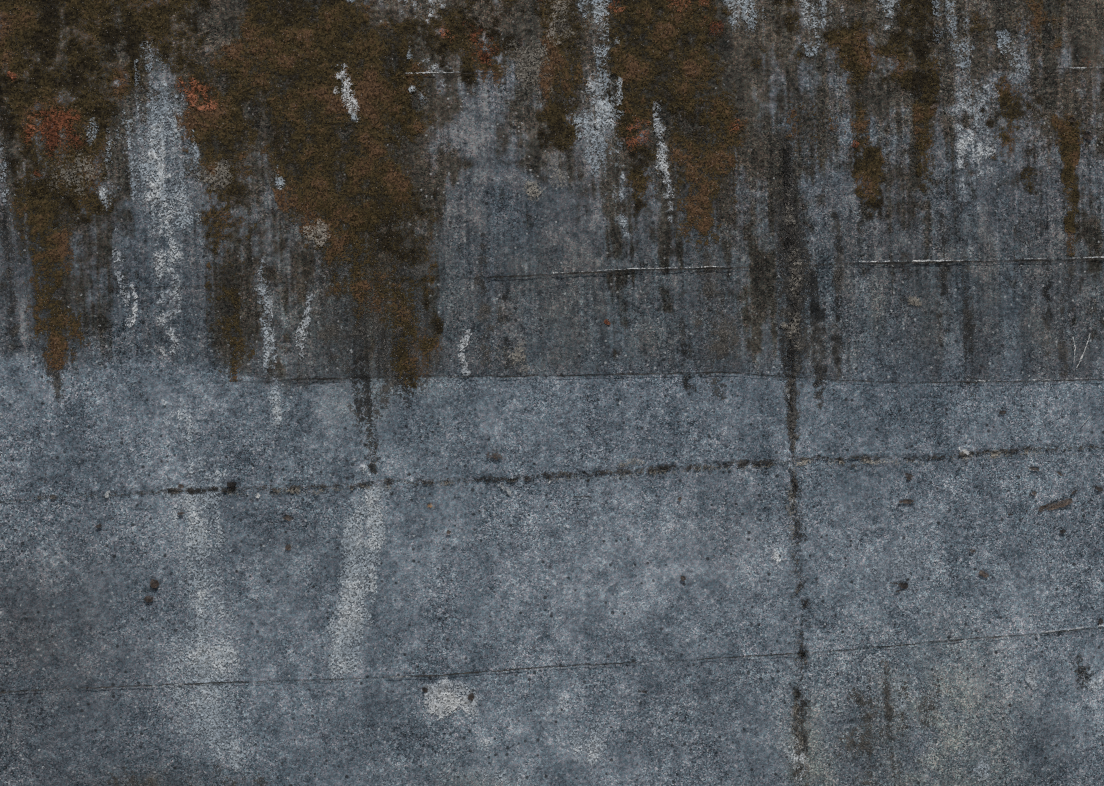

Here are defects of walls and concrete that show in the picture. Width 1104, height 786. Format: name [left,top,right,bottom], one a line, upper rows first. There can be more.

efflorescence [802,0,826,56]
efflorescence [126,54,200,356]
efflorescence [334,65,358,122]
rust [0,0,749,389]
efflorescence [574,35,622,174]
efflorescence [653,106,673,222]
efflorescence [956,86,995,192]
leakage [113,251,138,326]
leakage [258,261,275,367]
leakage [458,232,514,376]
leakage [774,126,846,439]
leakage [784,687,811,780]